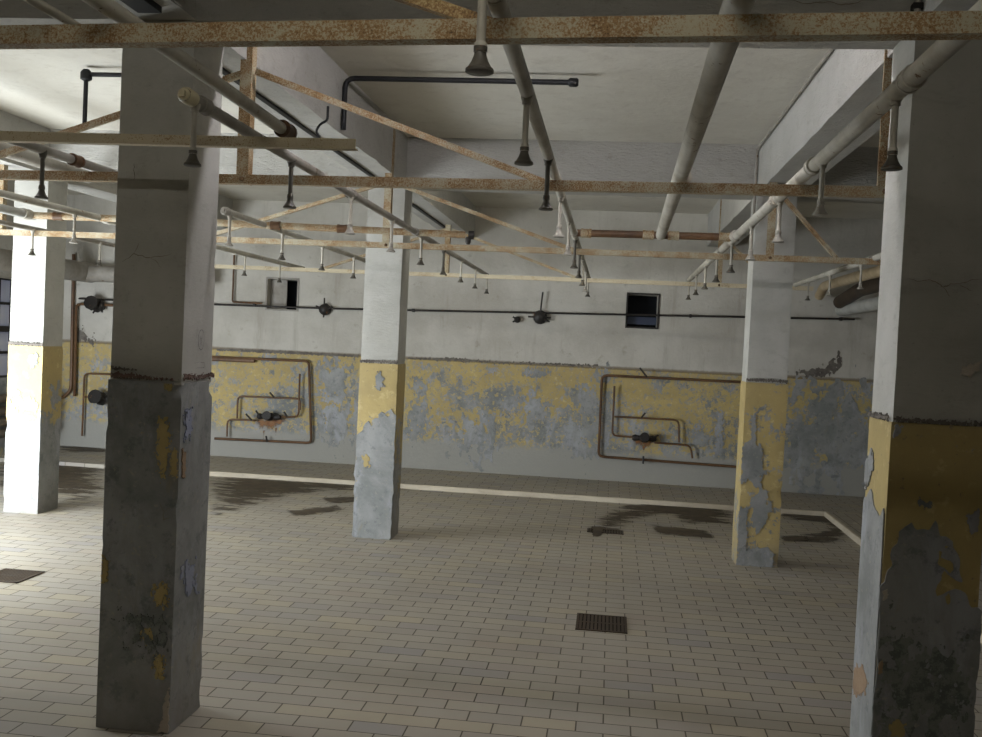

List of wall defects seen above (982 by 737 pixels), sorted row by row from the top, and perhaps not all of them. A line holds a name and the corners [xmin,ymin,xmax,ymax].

peeling [8,341,43,369]
peeling [111,365,215,381]
peeling [7,390,39,413]
peeling [154,406,193,484]
peeling [217,347,616,539]
damp [58,465,104,500]
peeling [736,412,775,568]
damp [592,504,731,538]
peeling [746,350,982,737]
peeling [100,554,109,584]